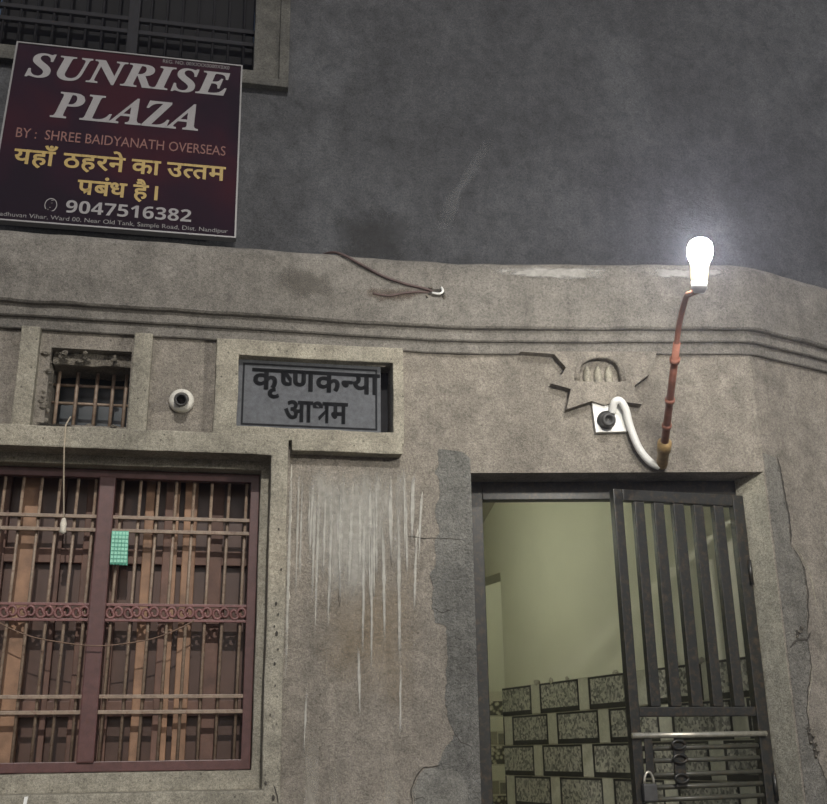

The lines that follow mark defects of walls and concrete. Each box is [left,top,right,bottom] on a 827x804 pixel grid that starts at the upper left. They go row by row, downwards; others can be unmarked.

leakage [286,464,423,666]
peeling [430,449,481,804]
crack [777,455,827,781]